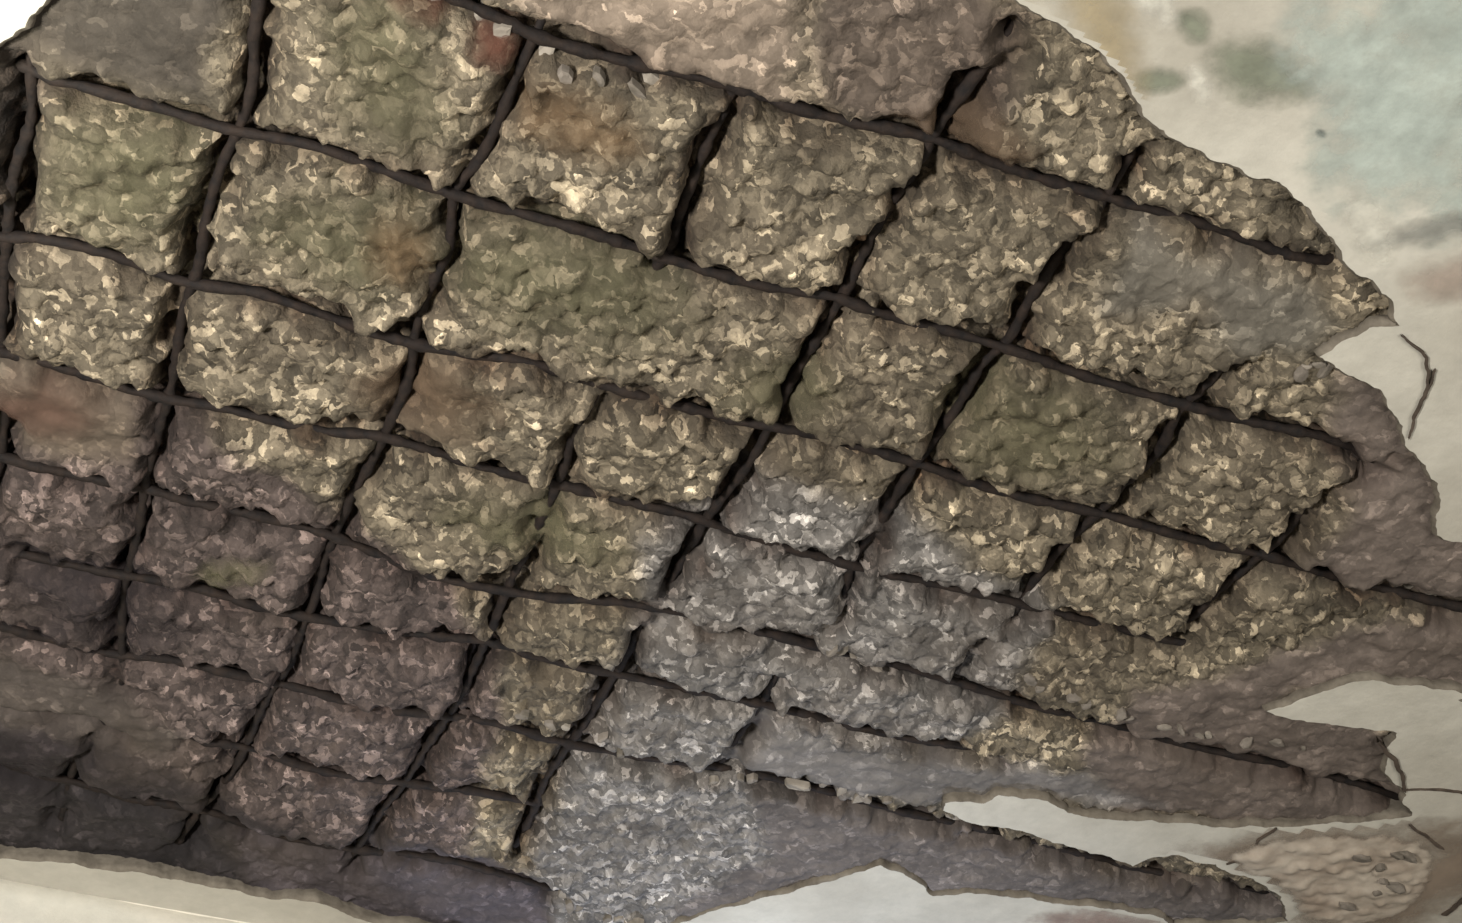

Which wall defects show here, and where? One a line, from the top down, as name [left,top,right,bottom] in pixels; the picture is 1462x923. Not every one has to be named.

leakage [1081,0,1206,95]
leakage [1220,47,1307,98]
leakage [1353,203,1462,255]
spalling [0,0,552,923]
spalling [224,0,1462,843]
spalling [380,464,1432,923]
crack [1376,736,1462,850]
crack [1441,898,1462,916]